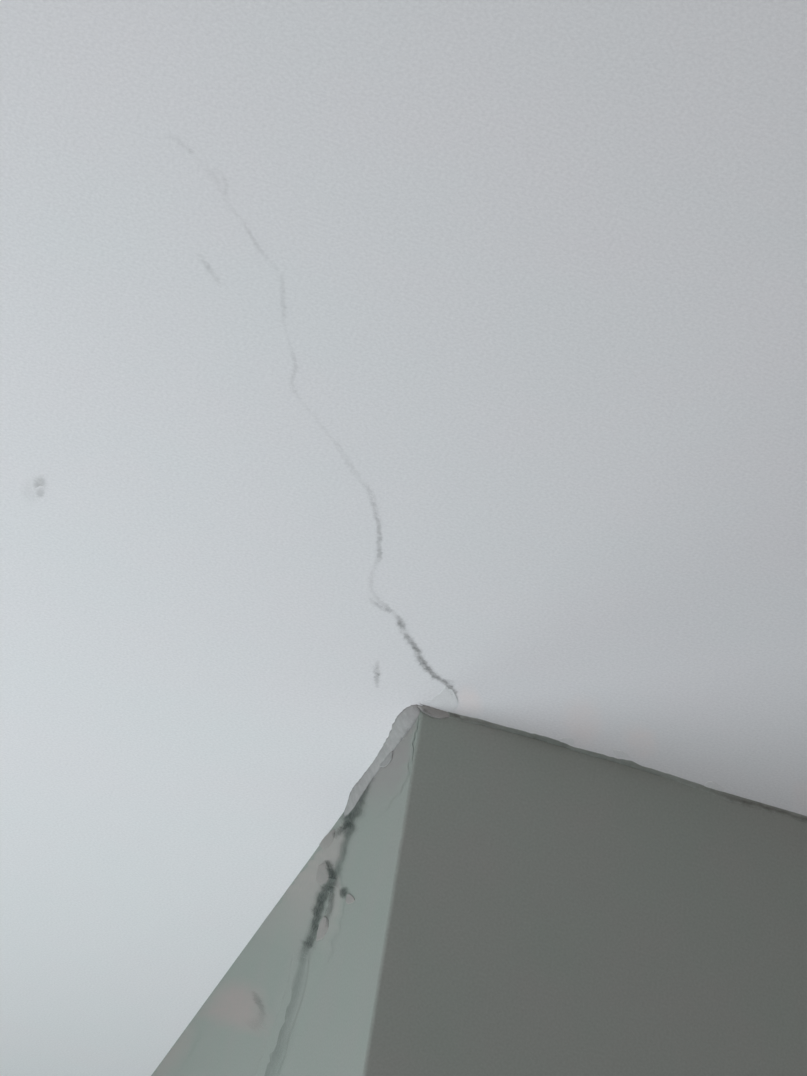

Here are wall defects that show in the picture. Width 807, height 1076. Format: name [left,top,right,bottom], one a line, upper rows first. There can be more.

crack [339,794,364,833]
crack [255,862,335,1076]